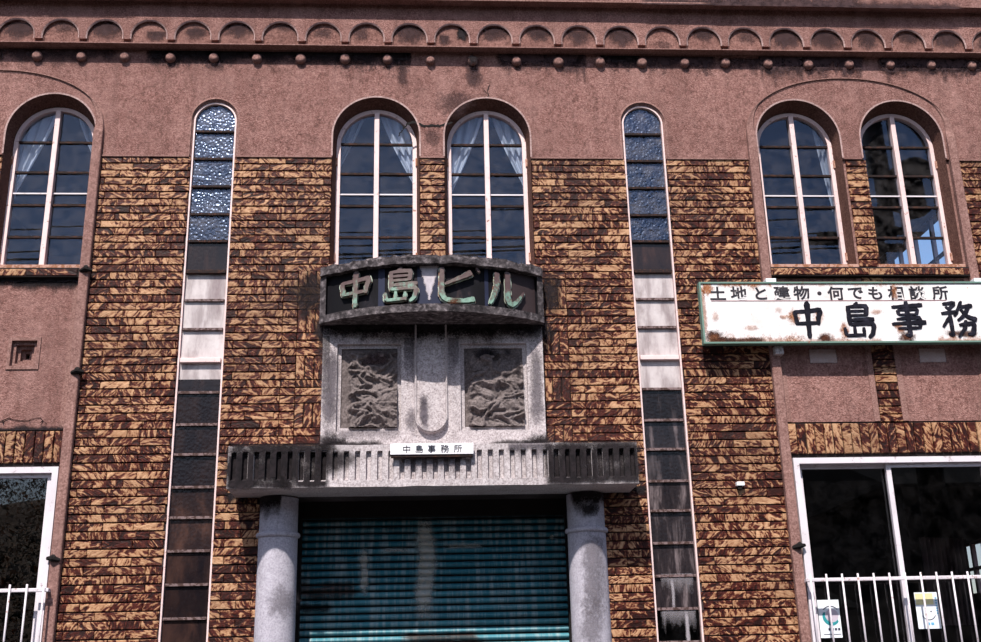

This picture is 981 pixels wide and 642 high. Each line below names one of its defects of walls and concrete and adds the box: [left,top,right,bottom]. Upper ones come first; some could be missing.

leakage [465,59,482,85]
rust [872,281,919,299]
rust [701,281,802,344]
rust [935,331,981,343]
rust [407,633,477,642]